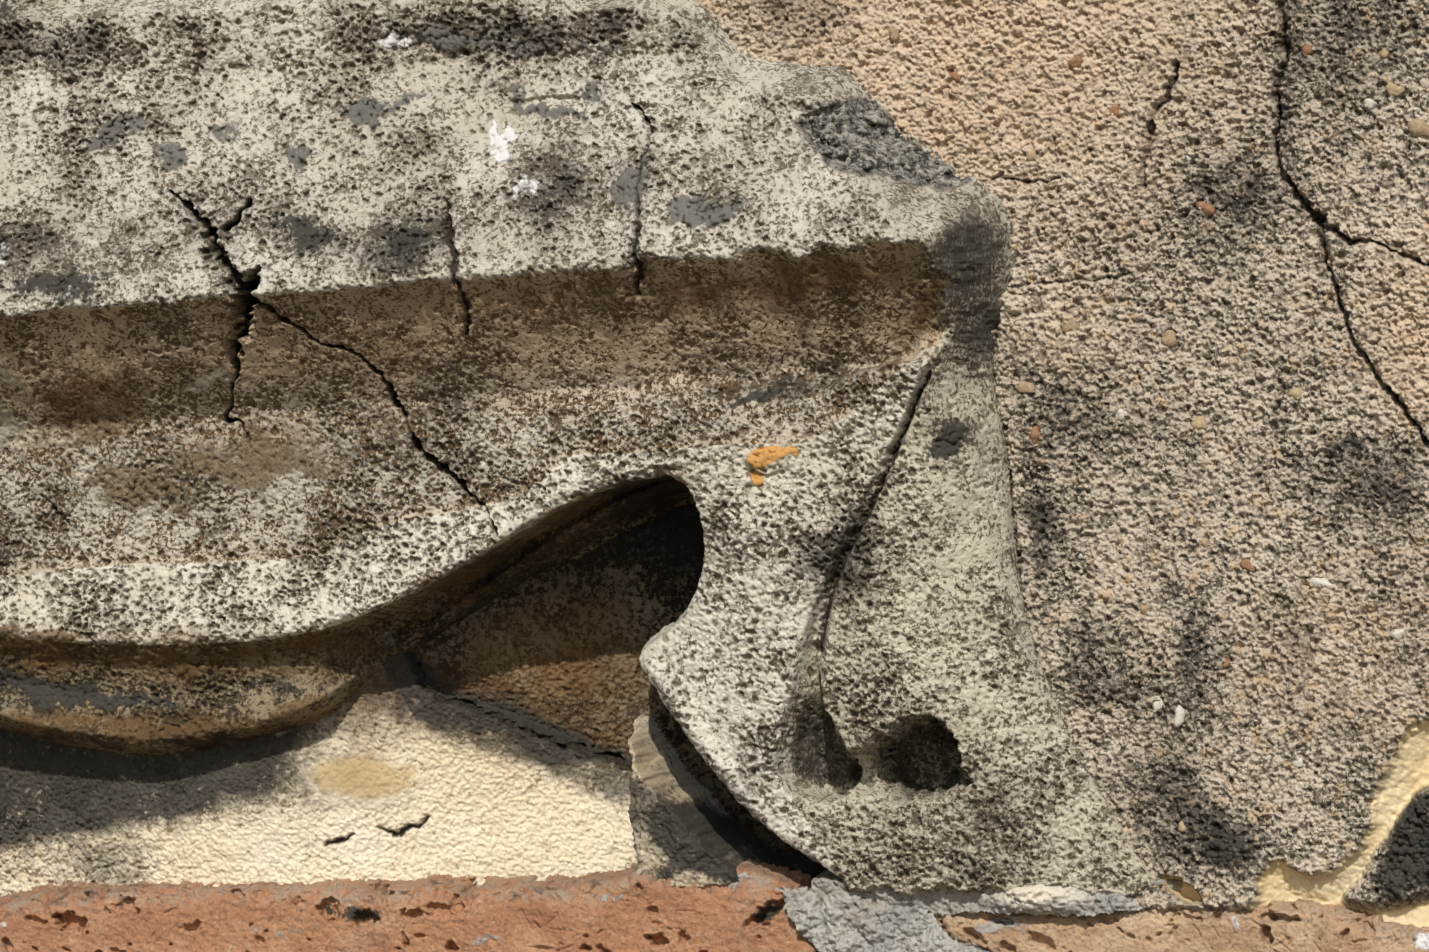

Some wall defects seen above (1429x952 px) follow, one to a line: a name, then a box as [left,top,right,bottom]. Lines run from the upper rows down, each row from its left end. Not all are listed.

crack [1144,64,1179,186]
crack [187,200,290,367]
crack [445,204,471,334]
crack [632,204,644,295]
crack [1275,0,1429,444]
crack [417,438,466,482]
crack [820,371,932,652]
spalling [1250,720,1429,928]
spalling [1162,876,1203,904]